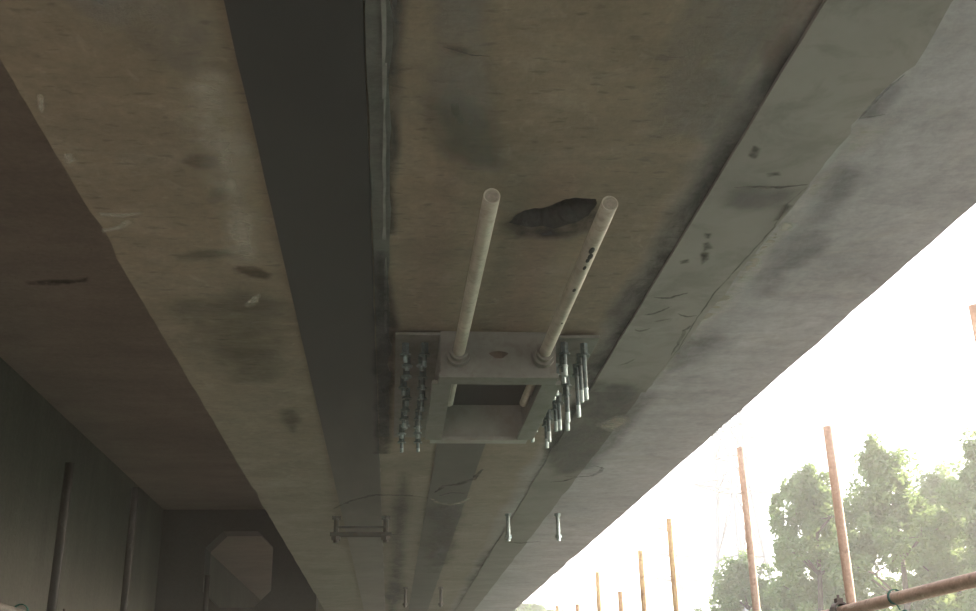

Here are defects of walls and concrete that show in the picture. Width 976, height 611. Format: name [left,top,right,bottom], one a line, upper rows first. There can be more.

water stain [760,45,792,93]
spalling [509,198,597,238]
water stain [679,136,737,225]
water stain [587,250,671,388]
water stain [549,386,638,473]